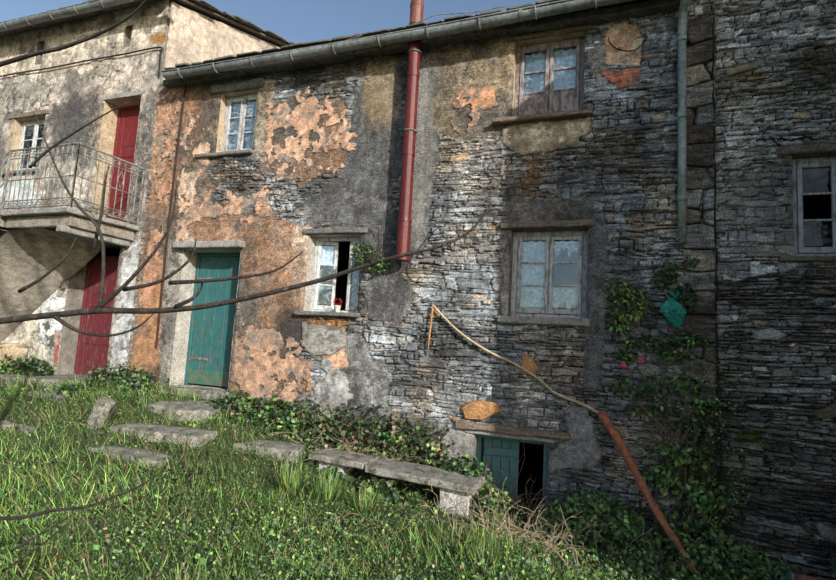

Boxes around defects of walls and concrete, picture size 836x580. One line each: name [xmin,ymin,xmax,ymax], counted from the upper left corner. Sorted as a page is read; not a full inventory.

spalling [599,22,643,91]
peeling [259,86,357,180]
peeling [450,84,499,136]
peeling [110,87,273,376]
peeling [230,322,354,418]